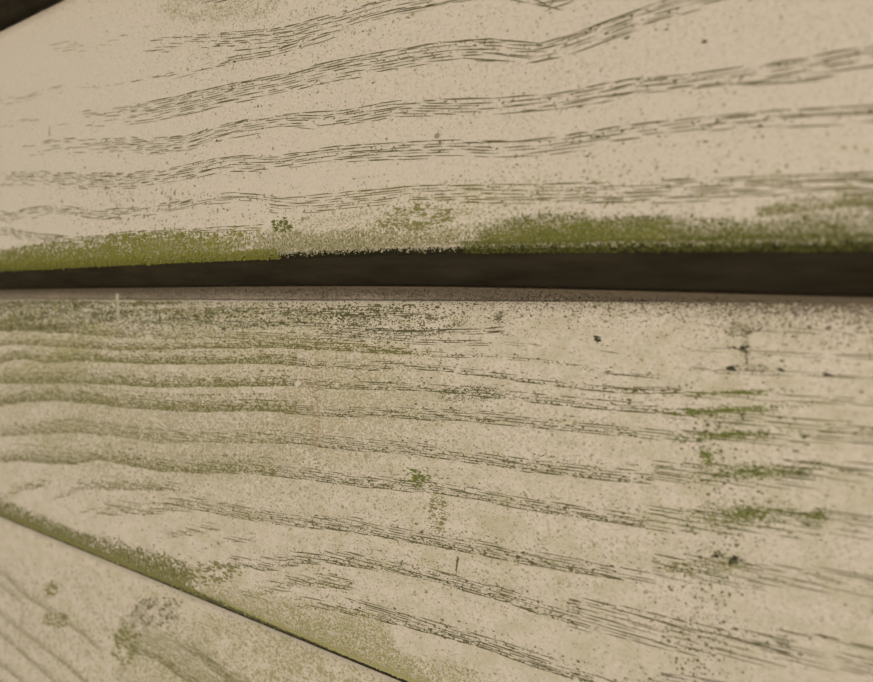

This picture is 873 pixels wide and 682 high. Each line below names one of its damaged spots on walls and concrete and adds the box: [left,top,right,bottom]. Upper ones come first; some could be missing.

damp [35,0,870,241]
damp [0,294,873,682]